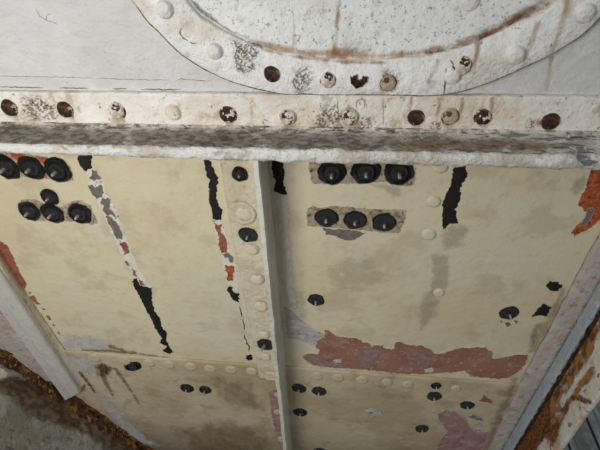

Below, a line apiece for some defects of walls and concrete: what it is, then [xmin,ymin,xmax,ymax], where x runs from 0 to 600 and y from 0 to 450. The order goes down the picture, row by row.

corrosion [233,40,303,72]
corrosion [324,48,365,64]
corrosion [453,2,547,63]
peeling [0,241,60,335]
peeling [55,155,173,354]
peeling [204,160,240,302]
peeling [283,306,528,380]
peeling [532,304,552,317]
peeling [546,281,562,291]
corrosion [0,377,129,450]
damp [97,364,138,401]
corrosion [517,318,600,450]